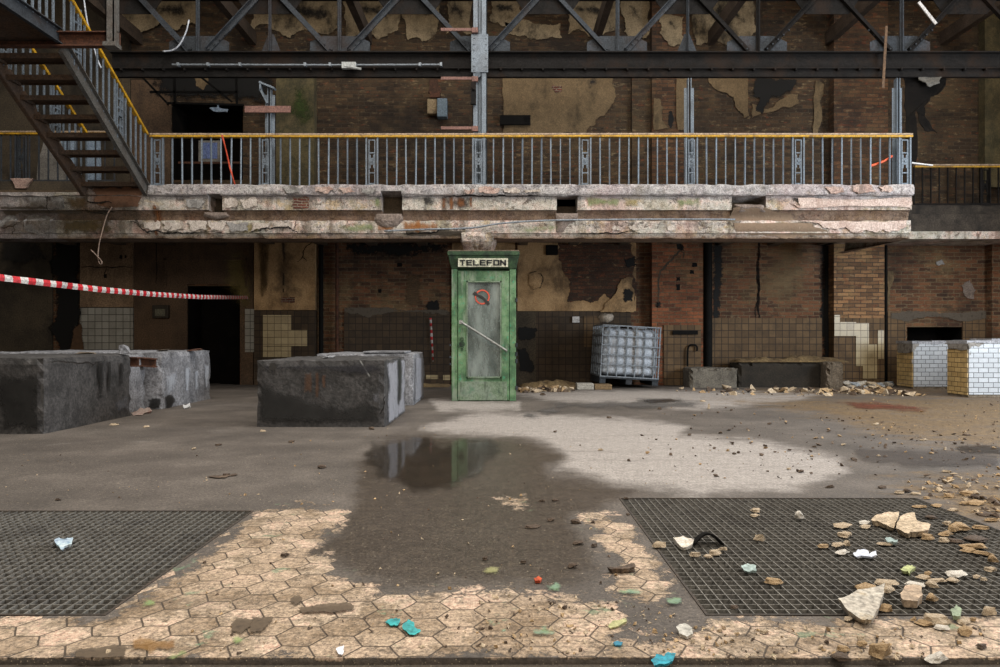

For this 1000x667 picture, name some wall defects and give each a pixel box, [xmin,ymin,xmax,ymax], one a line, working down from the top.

peeling [143,220,292,232]
peeling [729,184,912,239]
peeling [0,196,84,350]
flaking render [558,243,637,303]
crack [753,243,761,318]